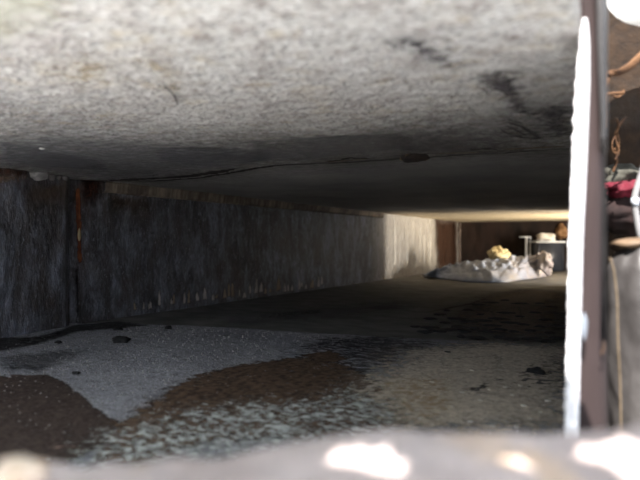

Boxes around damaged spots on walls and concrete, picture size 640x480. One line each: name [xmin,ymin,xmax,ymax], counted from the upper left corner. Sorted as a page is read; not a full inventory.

water stain [480,71,575,137]
crack [99,157,400,182]
crack [430,119,563,158]
rust [74,180,102,312]